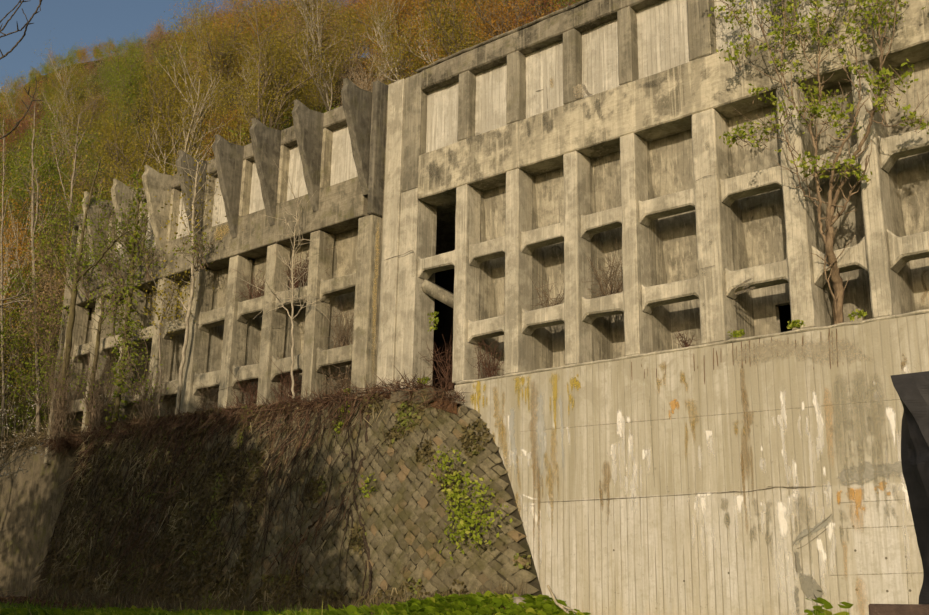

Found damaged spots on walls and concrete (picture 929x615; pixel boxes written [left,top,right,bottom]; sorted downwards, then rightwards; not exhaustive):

damp [470,375,581,473]
damp [734,495,749,536]
damp [772,392,798,537]
damp [798,392,832,513]
corrosion [837,488,864,514]
damp [875,397,910,556]
damp [775,522,835,612]